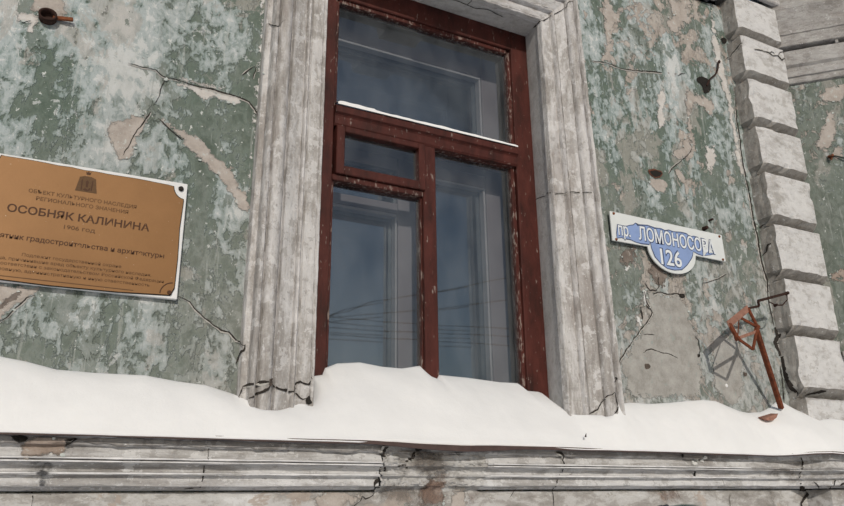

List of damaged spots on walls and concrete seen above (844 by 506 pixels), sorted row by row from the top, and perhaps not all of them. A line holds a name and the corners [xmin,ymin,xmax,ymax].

peeling [16,0,68,33]
peeling [177,77,240,105]
peeling [105,113,148,160]
peeling [161,117,250,214]